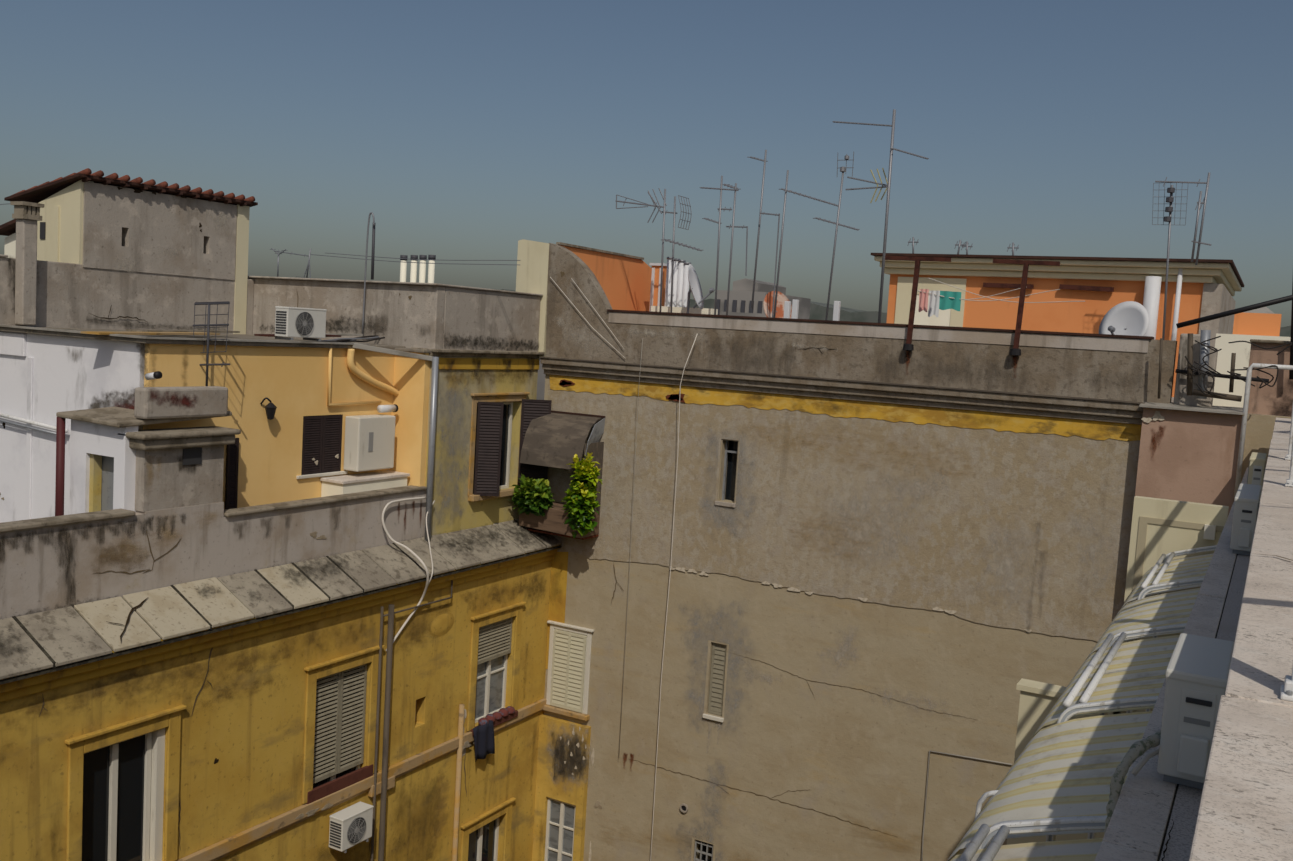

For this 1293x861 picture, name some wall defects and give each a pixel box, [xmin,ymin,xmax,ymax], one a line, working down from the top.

damp [0,516,184,601]
crack [93,531,181,640]
crack [192,648,213,714]
crack [733,653,972,719]
crack [630,759,896,837]